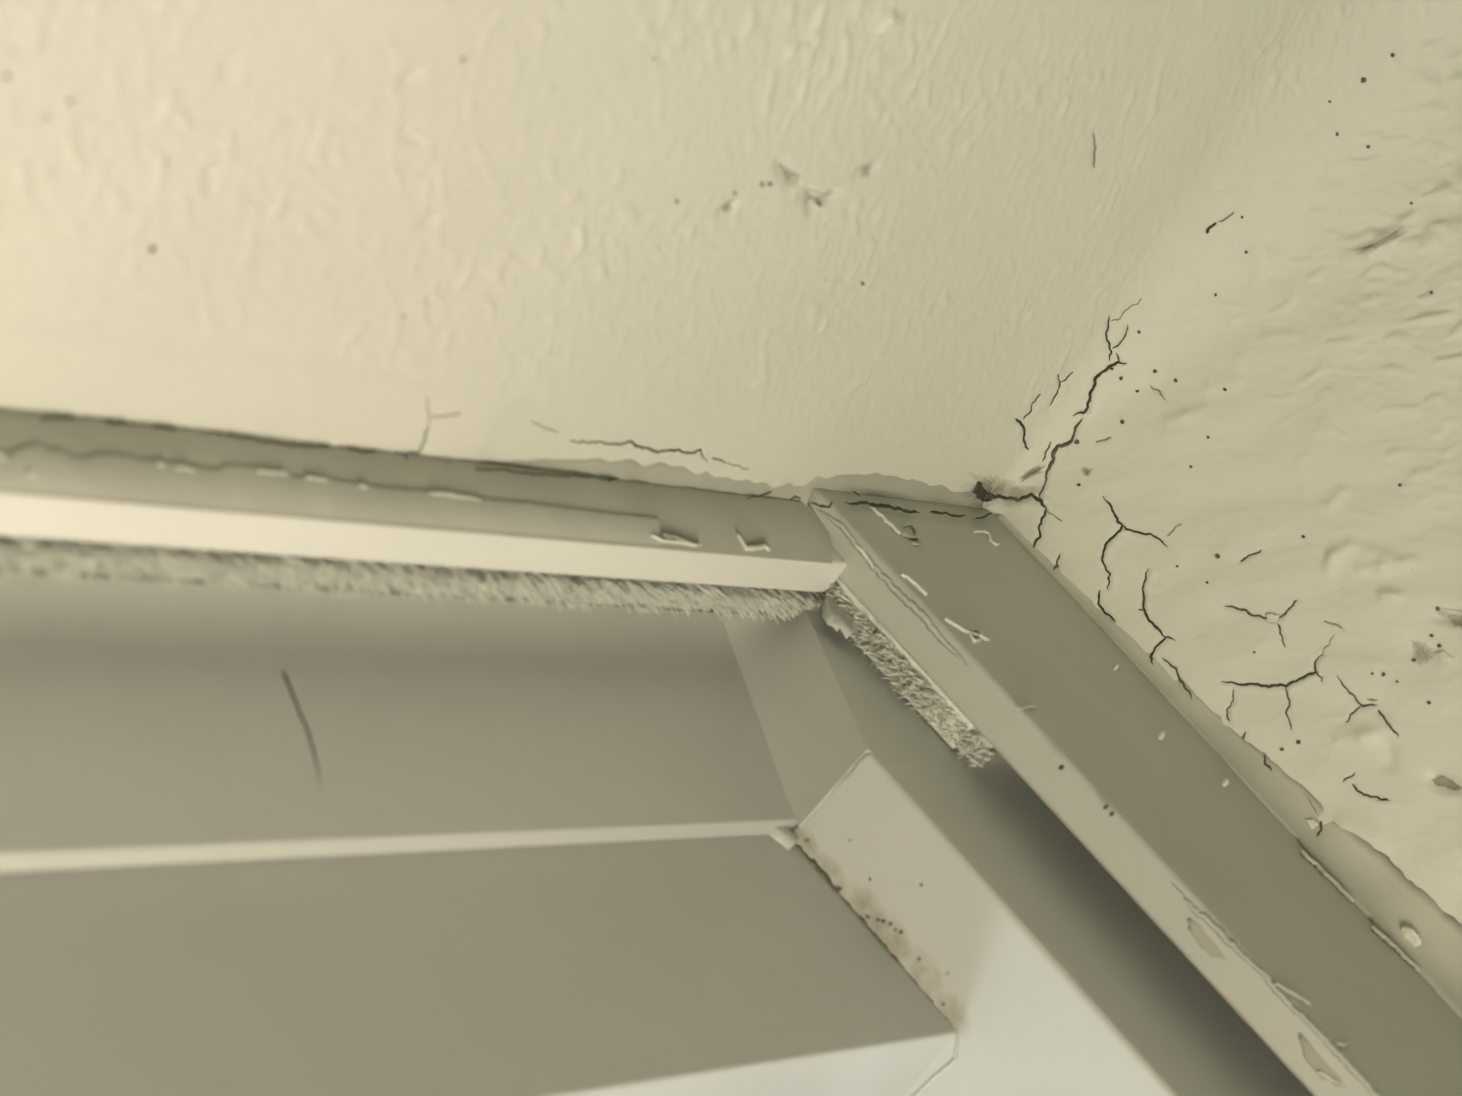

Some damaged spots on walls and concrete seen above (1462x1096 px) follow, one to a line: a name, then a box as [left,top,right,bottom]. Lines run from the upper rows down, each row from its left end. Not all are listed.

crack [40,299,1165,570]
peeling [0,444,701,547]
peeling [736,533,771,552]
peeling [867,502,923,546]
peeling [973,530,1001,547]
peeling [819,511,990,667]
crack [1097,496,1399,771]
flaking render [1433,776,1460,790]
peeling [1300,849,1355,904]
peeling [1370,925,1422,972]